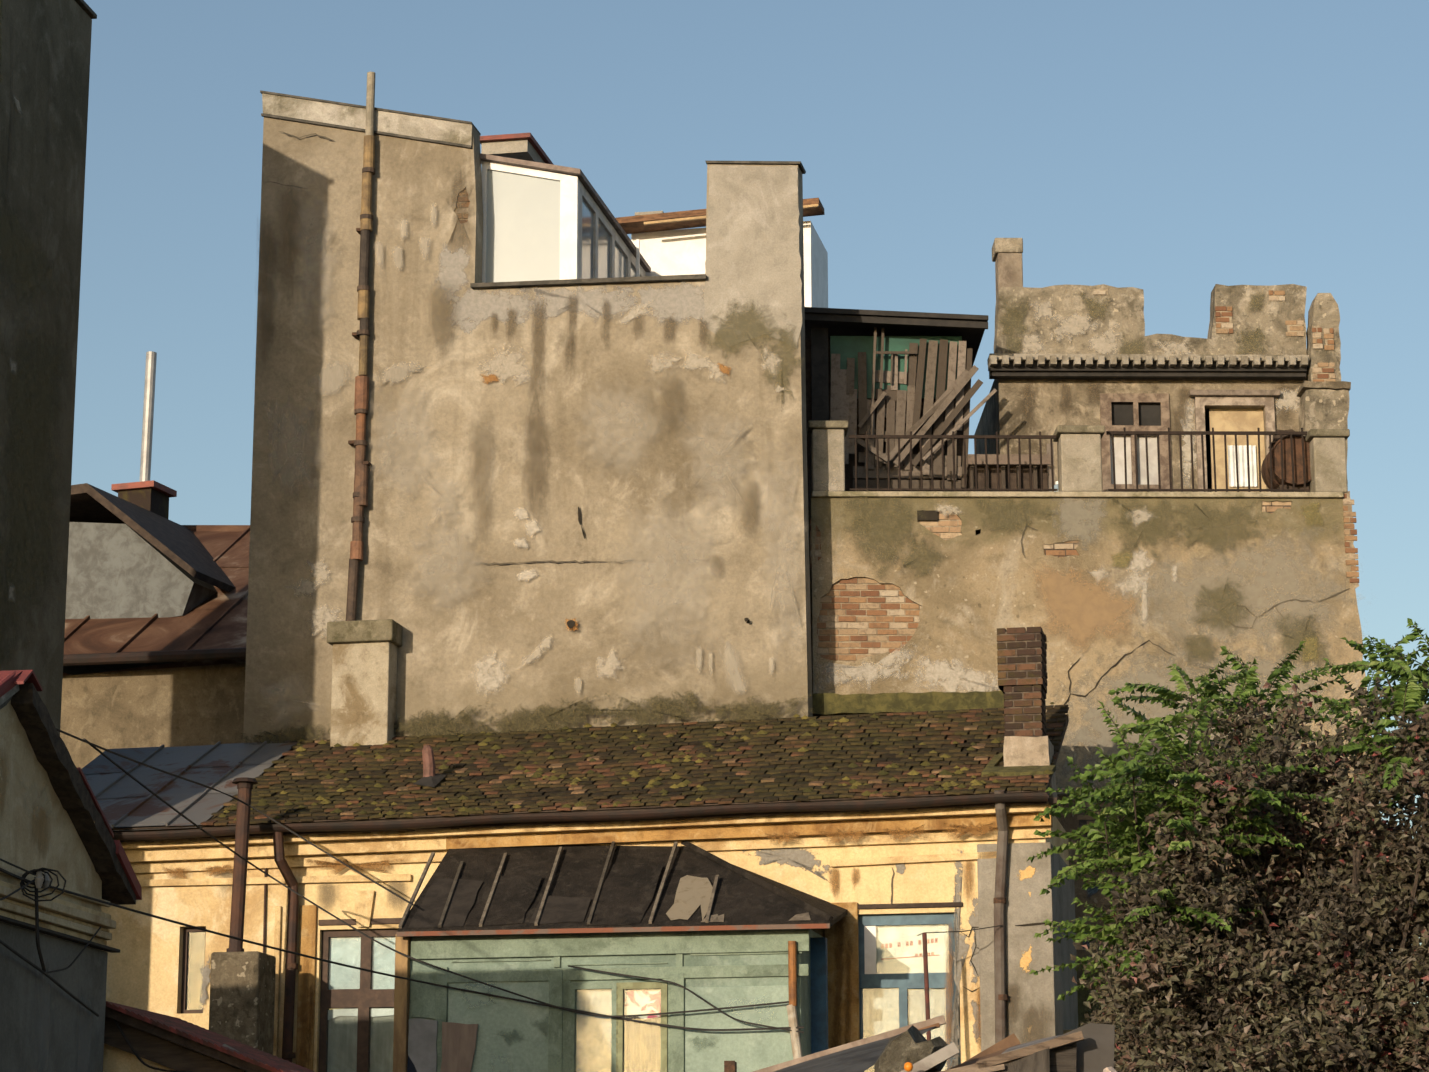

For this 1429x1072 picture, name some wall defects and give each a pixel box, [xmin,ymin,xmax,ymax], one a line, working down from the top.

damp [432,292,450,343]
damp [493,312,515,330]
damp [534,308,543,372]
damp [515,508,540,548]
flaking render [1343,491,1359,589]
damp [518,570,535,580]
flaking render [812,578,922,668]
crack [1230,588,1350,628]
crack [1064,640,1175,705]
peeling [743,848,831,880]
peeling [1017,866,1036,897]
peeling [1019,945,1032,973]